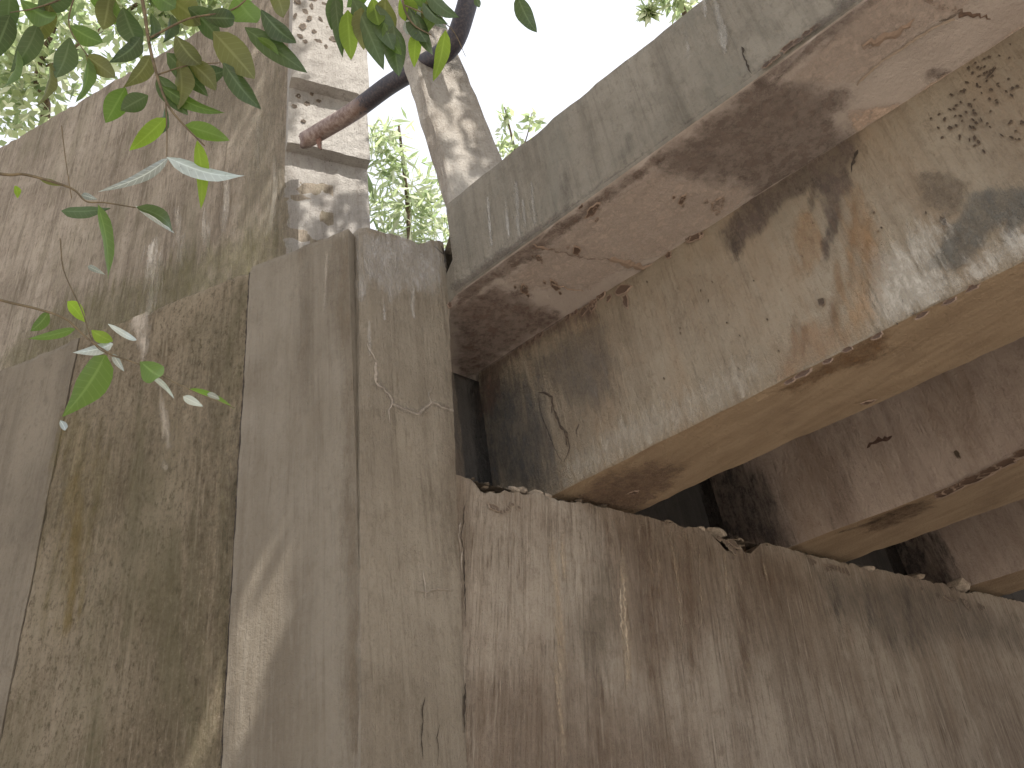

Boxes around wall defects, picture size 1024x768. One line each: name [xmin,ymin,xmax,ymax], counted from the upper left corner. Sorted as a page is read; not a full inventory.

spalling [930,30,1024,154]
damp [452,0,878,486]
damp [871,172,1024,317]
crack [367,344,454,421]
crack [539,392,579,468]